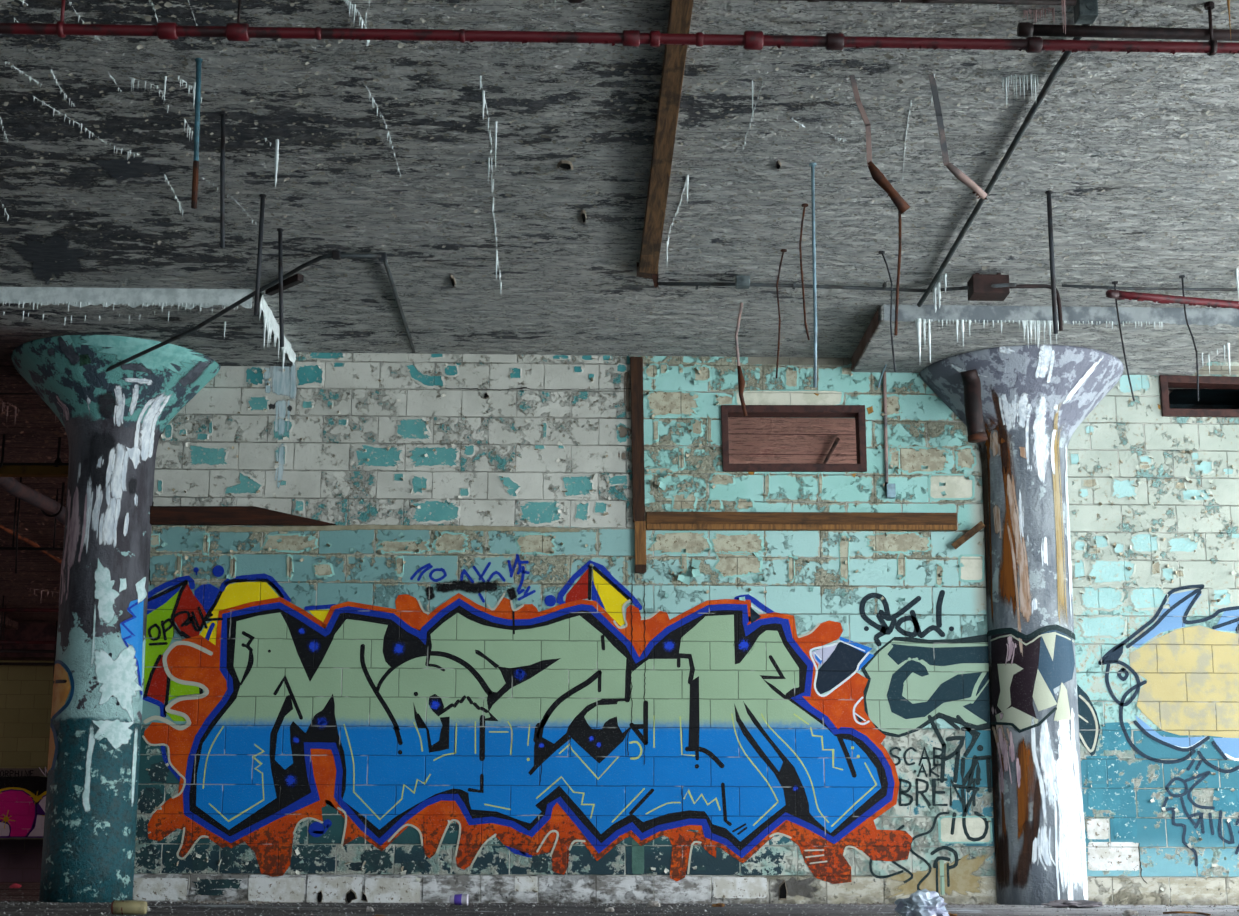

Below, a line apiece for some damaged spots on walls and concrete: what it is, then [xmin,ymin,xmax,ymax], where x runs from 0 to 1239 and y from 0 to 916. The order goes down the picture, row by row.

water stain [344,0,370,46]
peeling [0,0,1239,514]
peeling [350,417,630,577]
peeling [150,533,237,579]
peeling [250,533,335,580]
peeling [646,531,767,601]
peeling [838,532,985,597]
peeling [1072,528,1200,640]
peeling [1211,570,1236,608]
peeling [82,728,95,812]
peeling [938,816,993,843]
peeling [1085,722,1140,871]